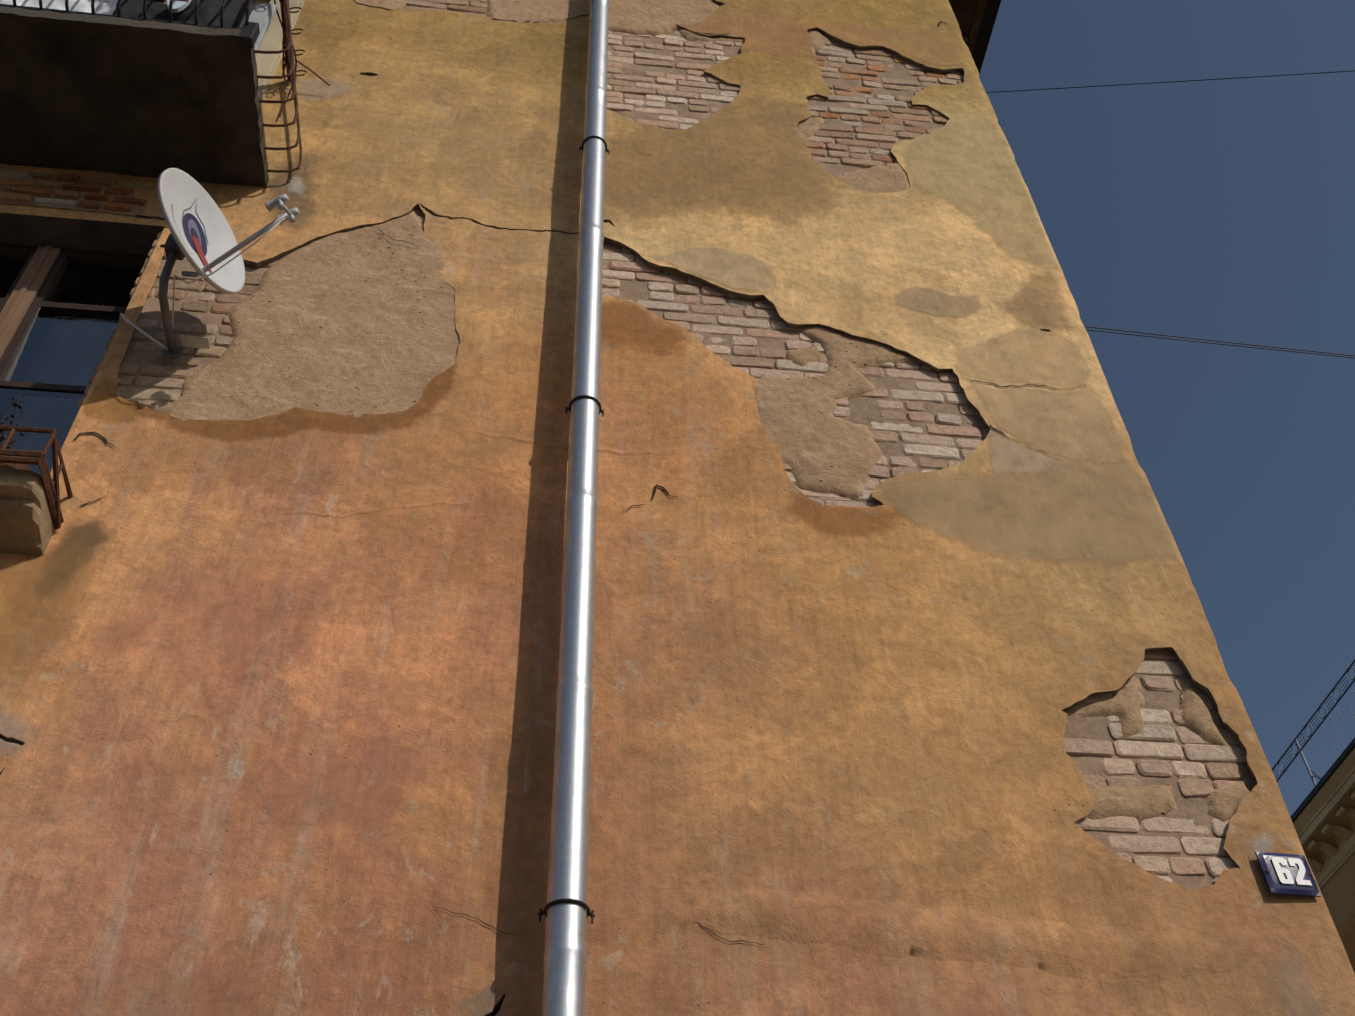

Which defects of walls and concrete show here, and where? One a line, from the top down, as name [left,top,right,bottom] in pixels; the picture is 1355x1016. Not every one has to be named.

spalling [355,0,591,23]
spalling [606,0,745,130]
spalling [793,27,964,193]
crack [418,203,615,234]
spalling [0,168,460,423]
spalling [602,237,990,507]
crack [0,733,25,775]
spalling [1062,647,1258,890]
crack [484,994,506,1016]